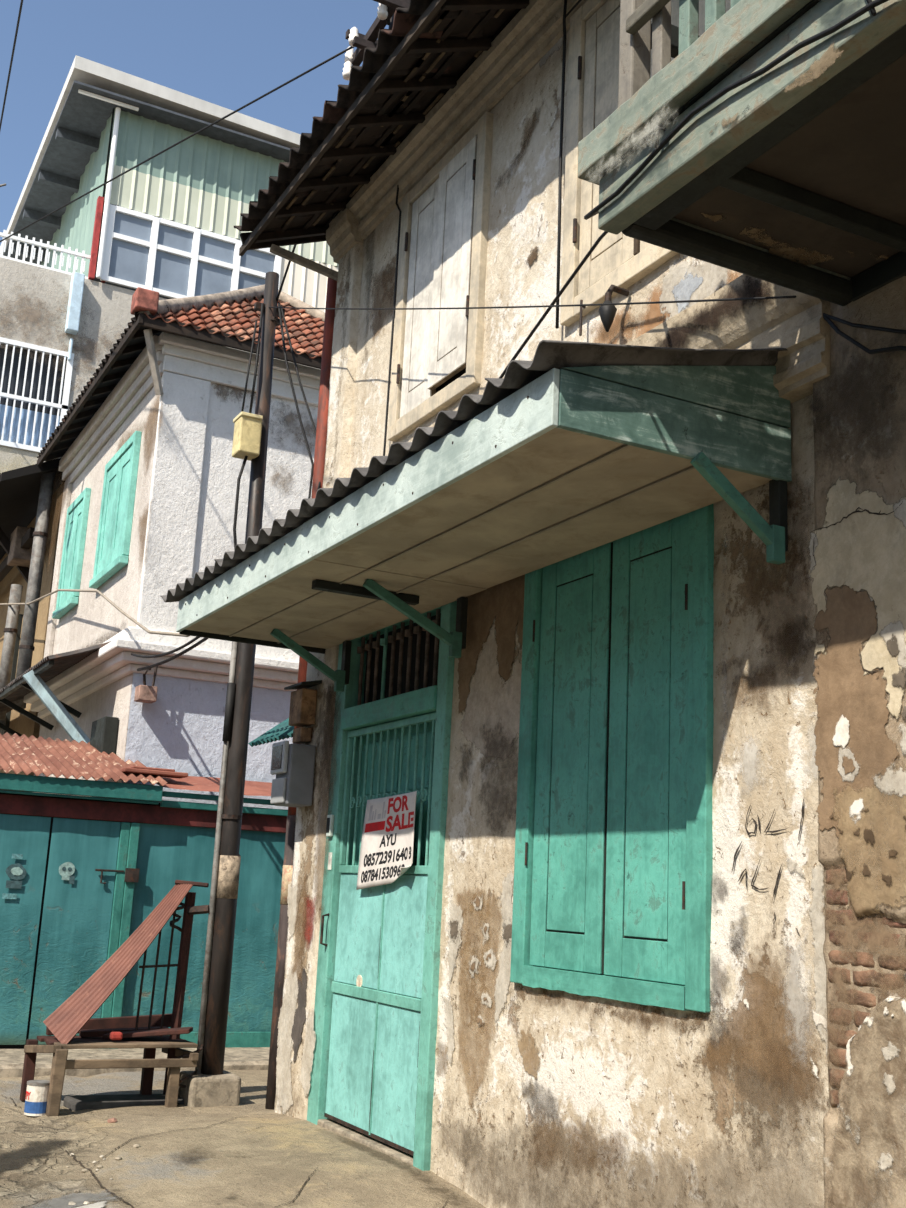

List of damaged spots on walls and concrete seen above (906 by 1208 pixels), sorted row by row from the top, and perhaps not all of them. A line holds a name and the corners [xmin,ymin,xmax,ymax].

damp [655,275,771,348]
crack [811,501,903,569]
flaking render [458,575,525,713]
peeling [808,478,906,844]
peeling [287,881,302,940]
peeling [276,960,316,1114]
flaking render [443,870,514,1104]
damp [517,1026,557,1161]
damp [742,947,814,1105]
flaking render [786,857,906,1144]
peeling [877,1153,893,1174]